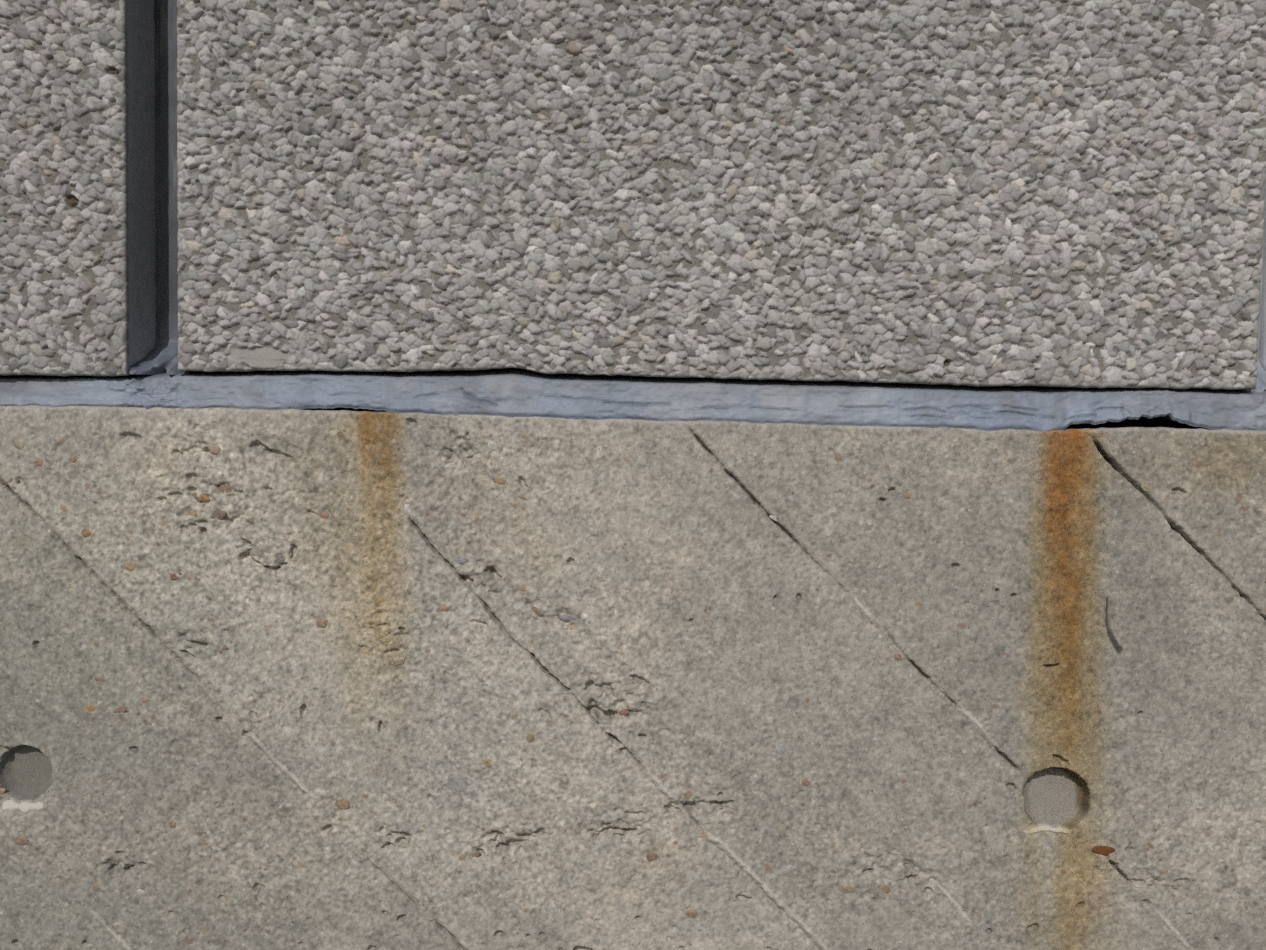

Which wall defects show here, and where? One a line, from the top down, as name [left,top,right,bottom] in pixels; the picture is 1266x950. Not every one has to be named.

crack [798,545,852,598]
crack [507,633,527,655]
crack [880,625,911,658]
crack [941,689,961,711]
crack [571,693,652,777]
crack [677,798,709,837]